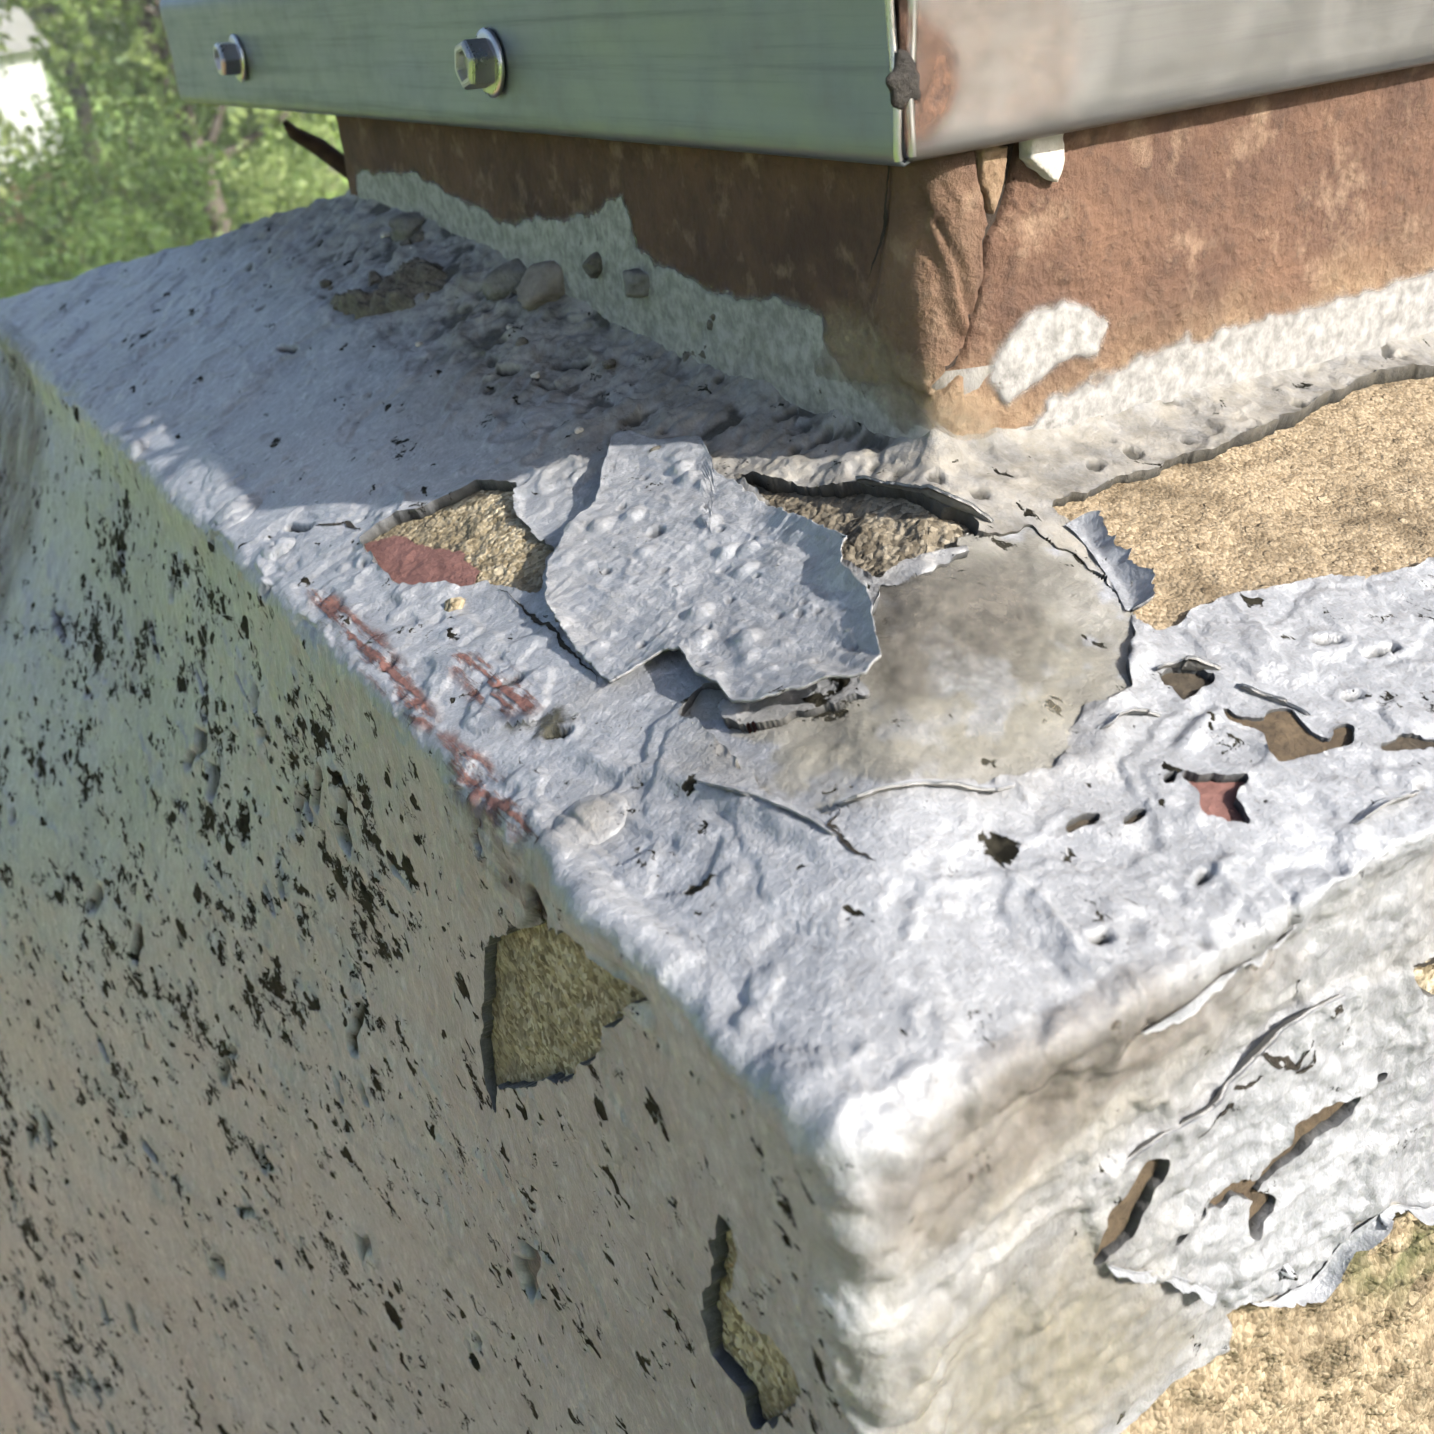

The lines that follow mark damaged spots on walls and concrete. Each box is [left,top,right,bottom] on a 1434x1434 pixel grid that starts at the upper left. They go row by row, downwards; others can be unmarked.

crack [867,166,891,279]
crack [982,143,1014,247]
crack [945,314,970,371]
peeling [364,377,1434,838]
spalling [491,921,646,1085]
peeling [1127,994,1347,1164]
flaking render [1105,1202,1434,1434]